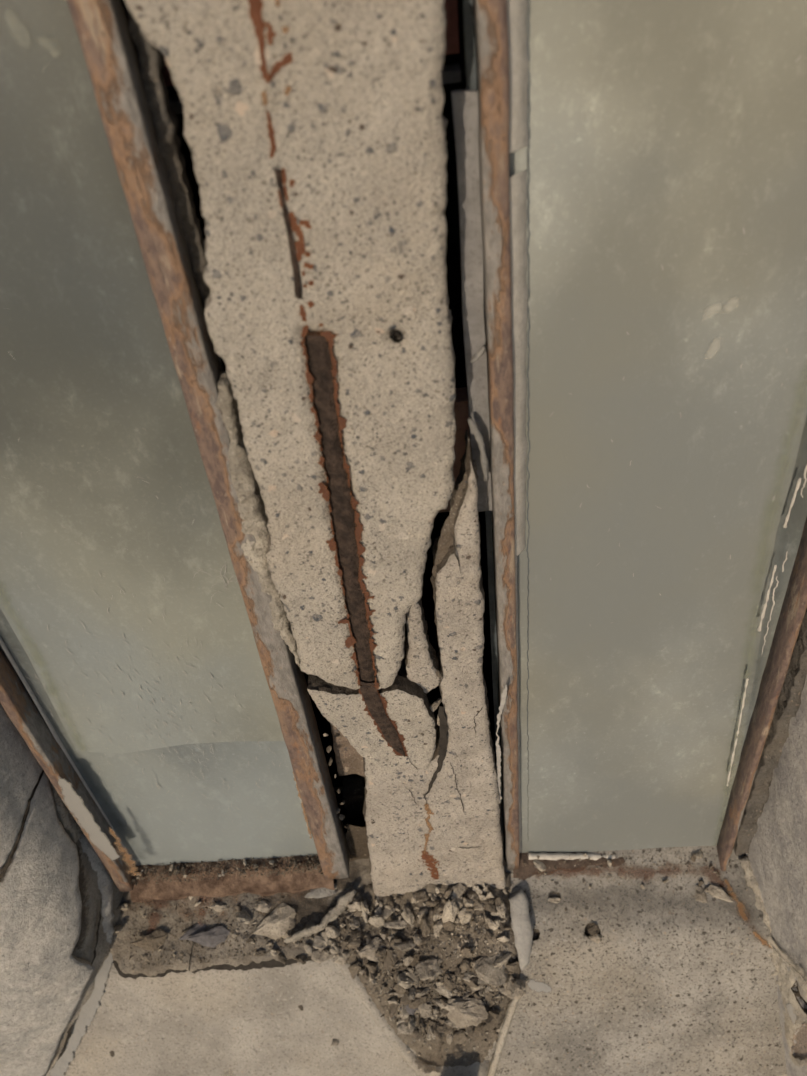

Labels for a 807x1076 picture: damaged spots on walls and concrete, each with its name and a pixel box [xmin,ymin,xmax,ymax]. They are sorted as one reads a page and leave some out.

rust [248,0,293,158]
rust [278,168,314,288]
rust [299,301,408,756]
crack [405,706,483,814]
crack [0,770,44,882]
rust [419,803,440,880]
peeling [178,922,230,948]
spalling [313,872,540,1076]